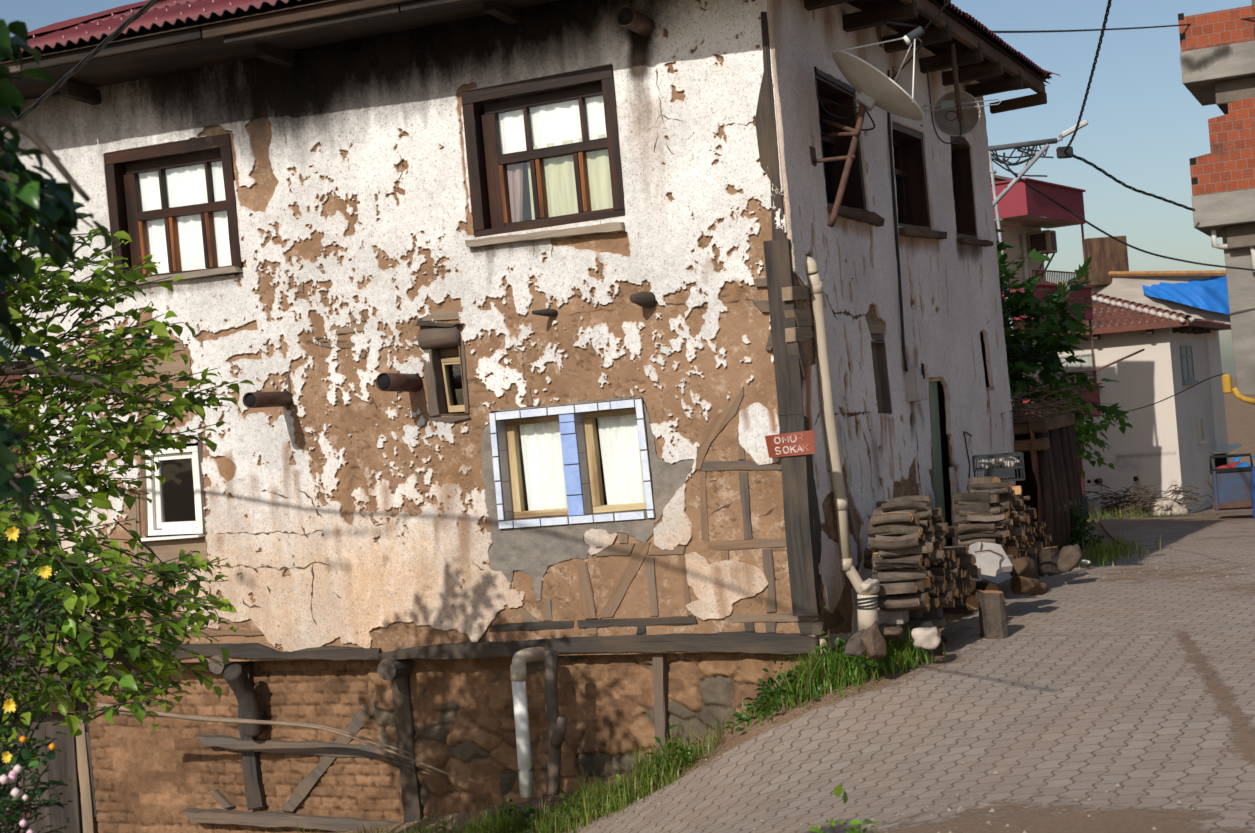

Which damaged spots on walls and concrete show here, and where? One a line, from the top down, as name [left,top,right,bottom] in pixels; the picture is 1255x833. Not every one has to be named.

peeling [665,56,685,102]
crack [823,249,865,321]
peeling [26,82,870,663]
crack [208,472,341,625]